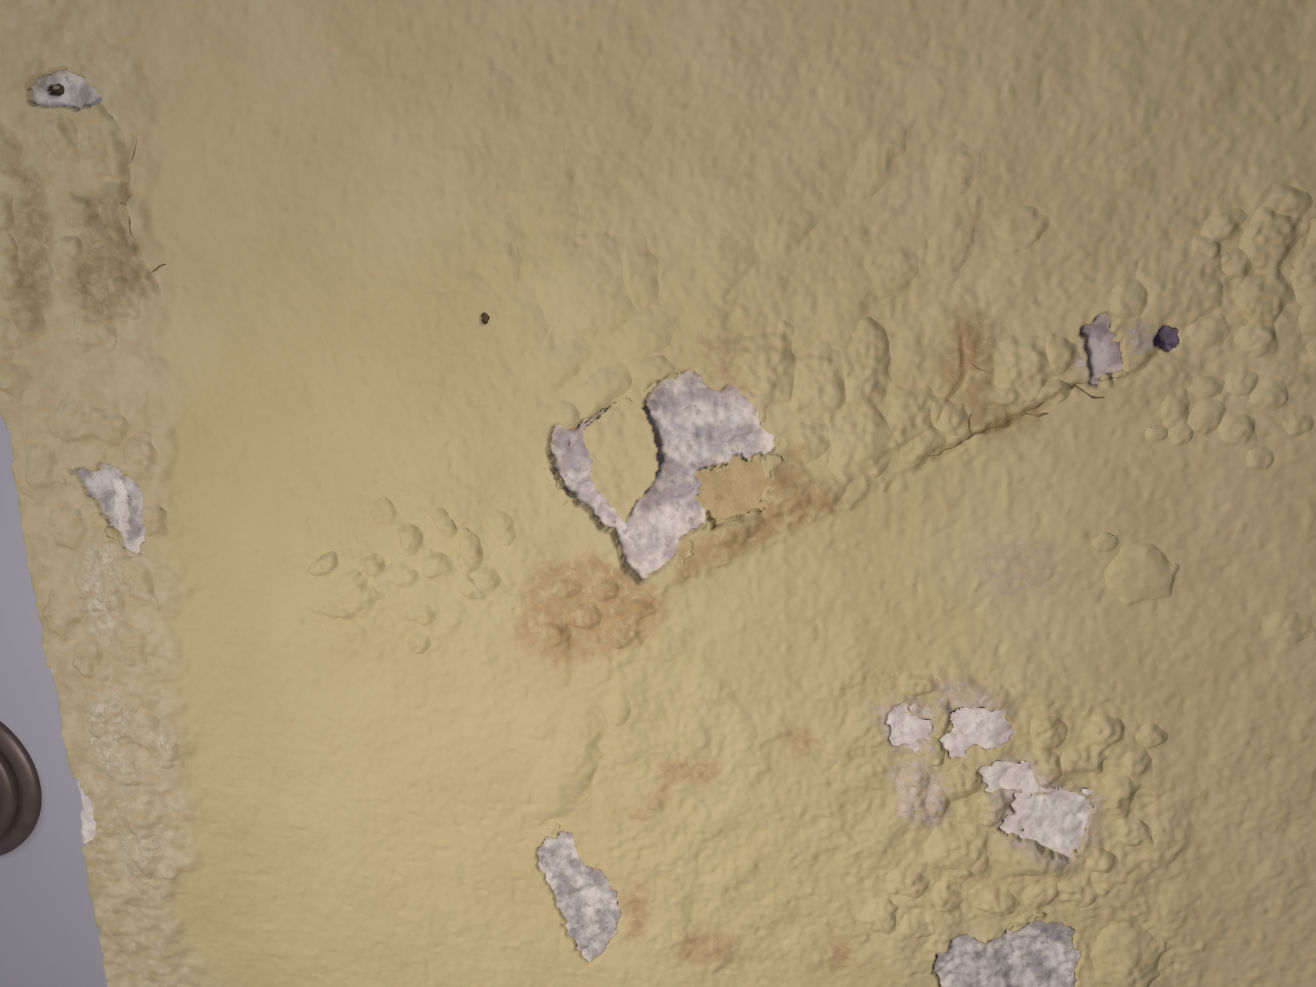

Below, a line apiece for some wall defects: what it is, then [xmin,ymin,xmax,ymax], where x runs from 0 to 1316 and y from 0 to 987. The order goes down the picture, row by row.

peeling [31,68,102,109]
crack [922,343,1157,465]
peeling [1080,312,1123,386]
peeling [72,463,146,553]
peeling [543,371,783,580]
peeling [886,702,1094,858]
peeling [537,823,621,962]
peeling [933,912,1082,987]